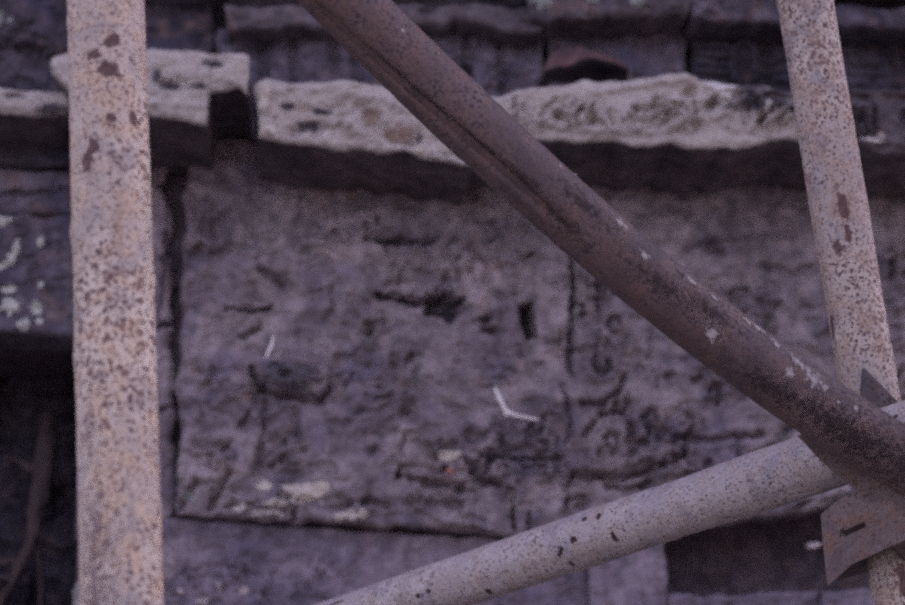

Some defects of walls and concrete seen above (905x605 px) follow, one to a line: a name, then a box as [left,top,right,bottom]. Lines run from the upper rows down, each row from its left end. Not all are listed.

spalling [258,82,270,113]
spalling [259,124,277,137]
spalling [410,148,465,164]